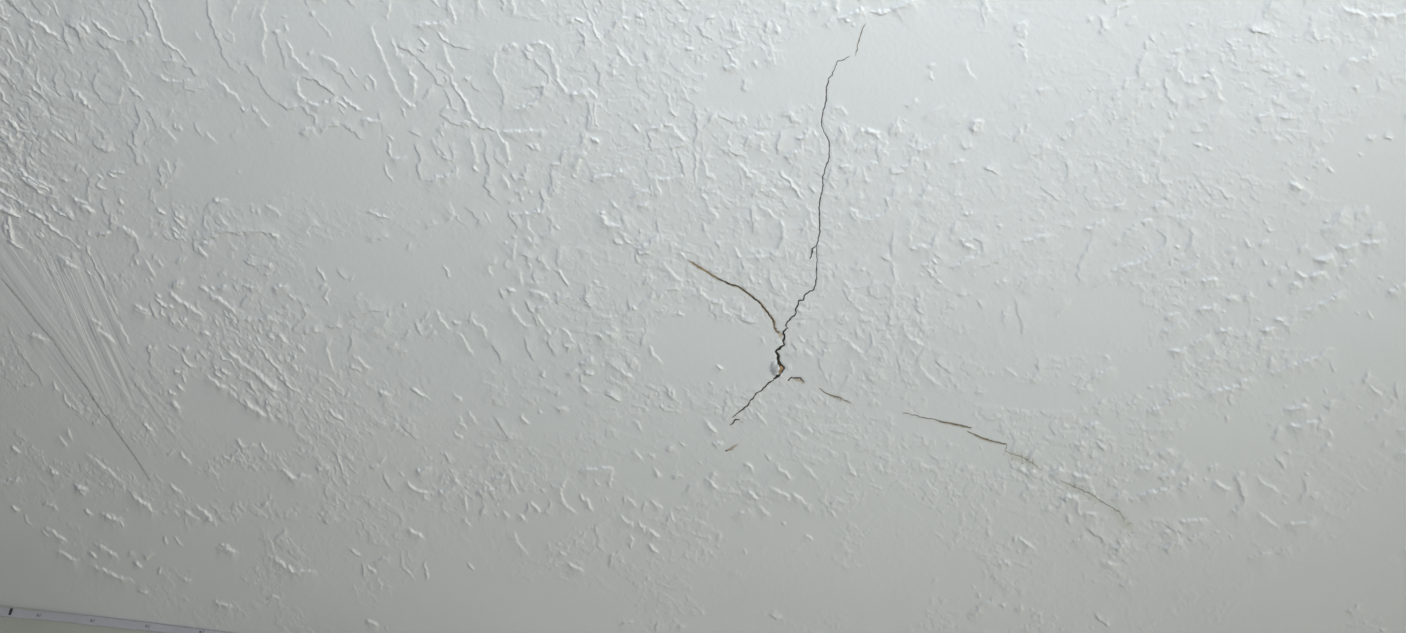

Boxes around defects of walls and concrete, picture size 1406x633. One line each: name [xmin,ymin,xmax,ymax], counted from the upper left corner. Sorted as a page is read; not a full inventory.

crack [688,24,866,425]
crack [907,413,1125,521]